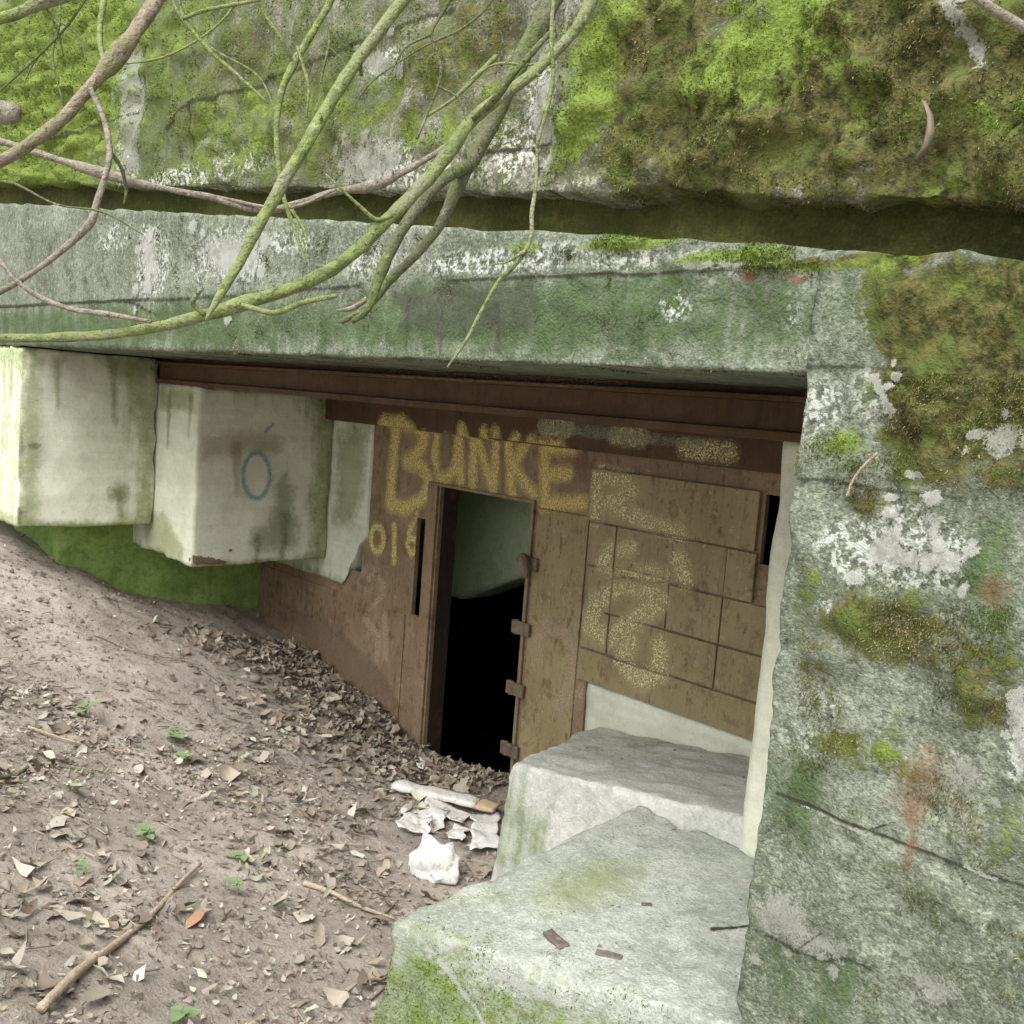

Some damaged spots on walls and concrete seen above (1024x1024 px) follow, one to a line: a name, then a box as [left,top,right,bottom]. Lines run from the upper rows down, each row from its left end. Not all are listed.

crack [776,791,1024,887]